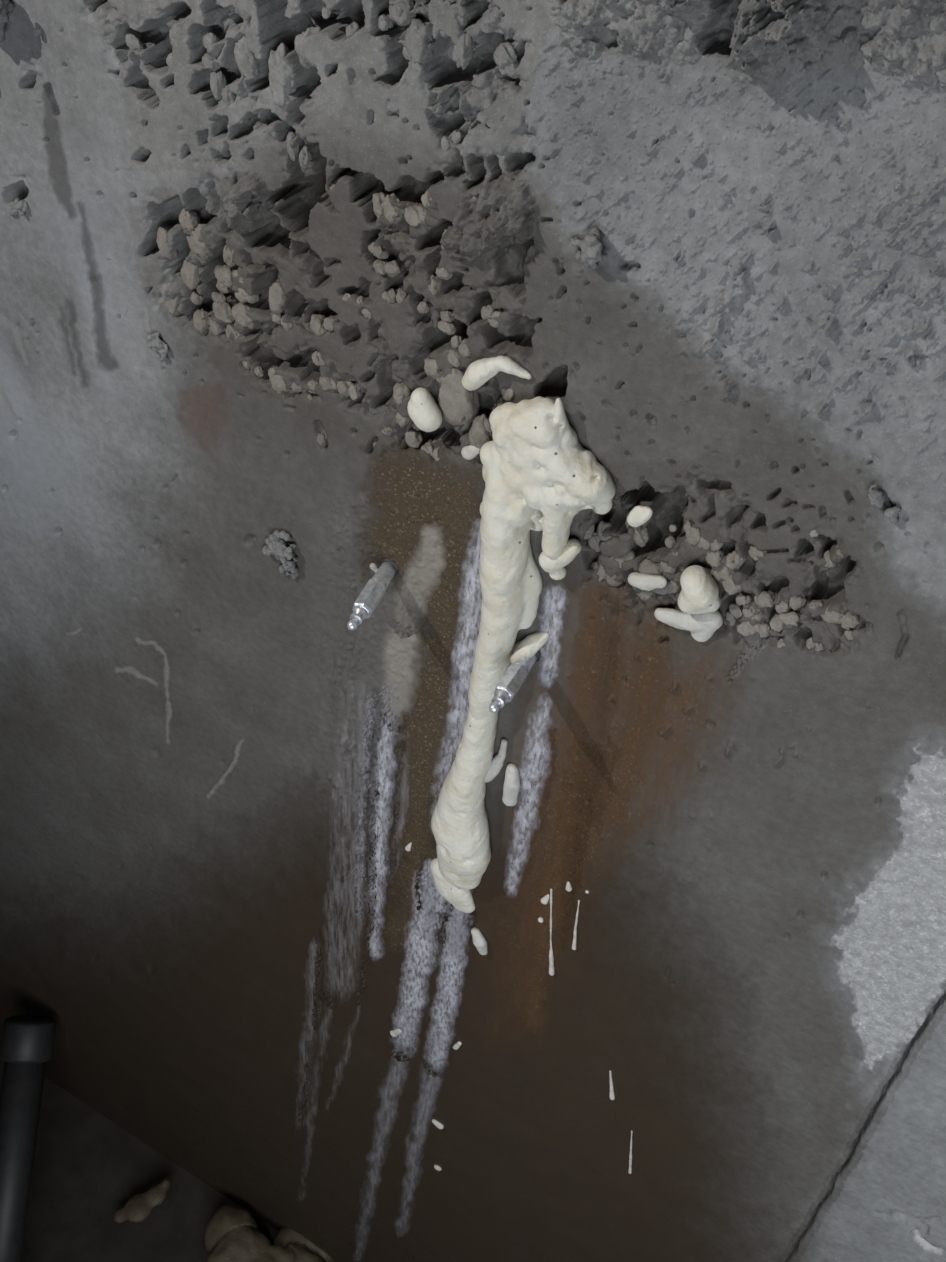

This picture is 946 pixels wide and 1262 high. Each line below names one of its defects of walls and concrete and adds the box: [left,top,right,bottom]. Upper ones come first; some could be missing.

rust [367,439,481,953]
water stain [433,531,482,812]
water stain [0,588,730,1262]
water stain [834,749,946,1069]
crack [778,981,946,1262]
spalling [867,1201,946,1259]